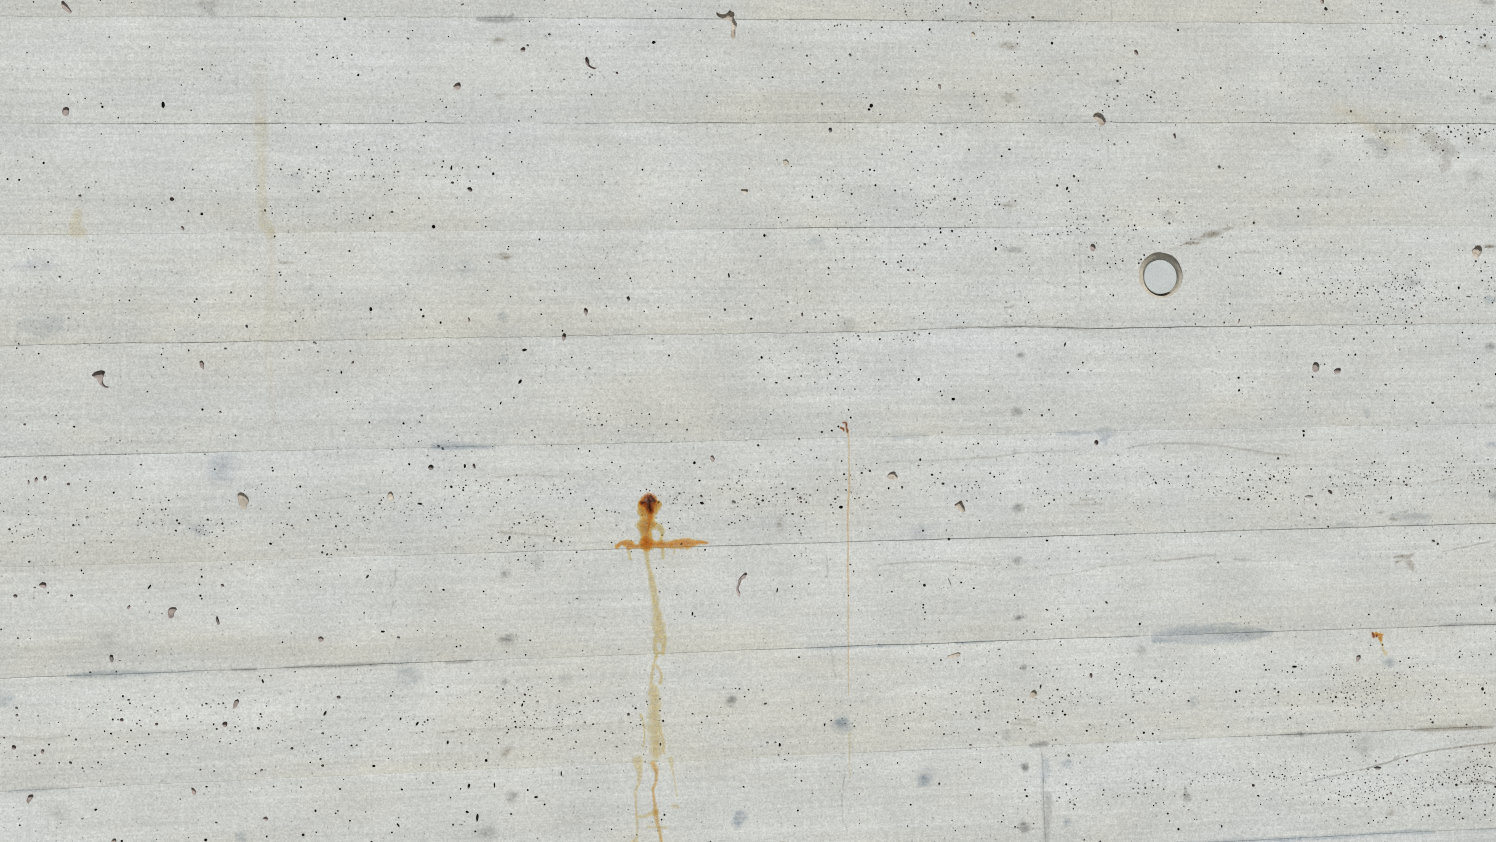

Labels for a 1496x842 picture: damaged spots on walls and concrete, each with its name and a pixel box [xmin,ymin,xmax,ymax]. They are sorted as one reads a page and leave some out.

corrosion [640,494,657,513]